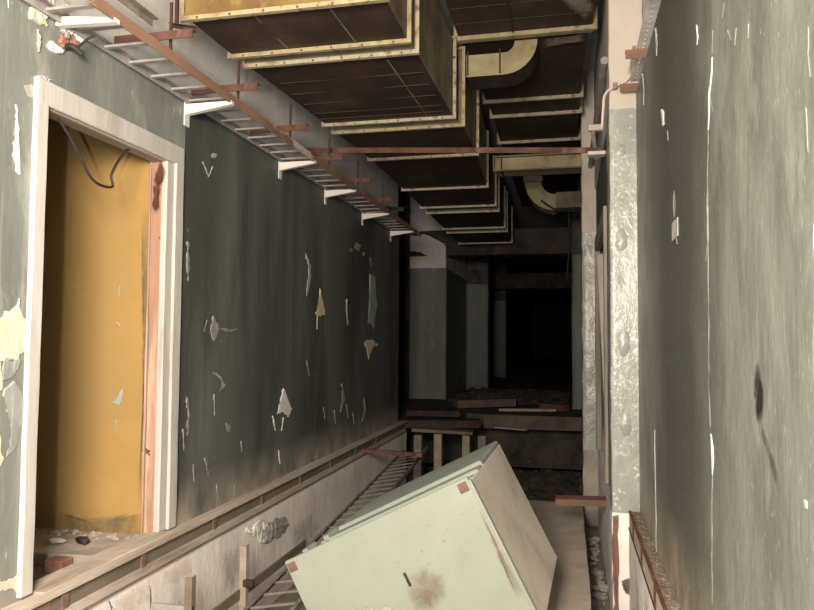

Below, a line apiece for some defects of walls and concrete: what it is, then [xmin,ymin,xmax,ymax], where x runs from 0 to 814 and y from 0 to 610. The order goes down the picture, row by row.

spalling [28,6,85,54]
peeling [12,104,21,175]
corrosion [152,162,164,210]
peeling [305,253,325,329]
peeling [350,243,378,328]
peeling [204,316,237,341]
peeling [365,339,378,360]
peeling [0,299,27,466]
peeling [182,396,190,450]
peeling [272,388,292,431]
peeling [323,383,367,425]